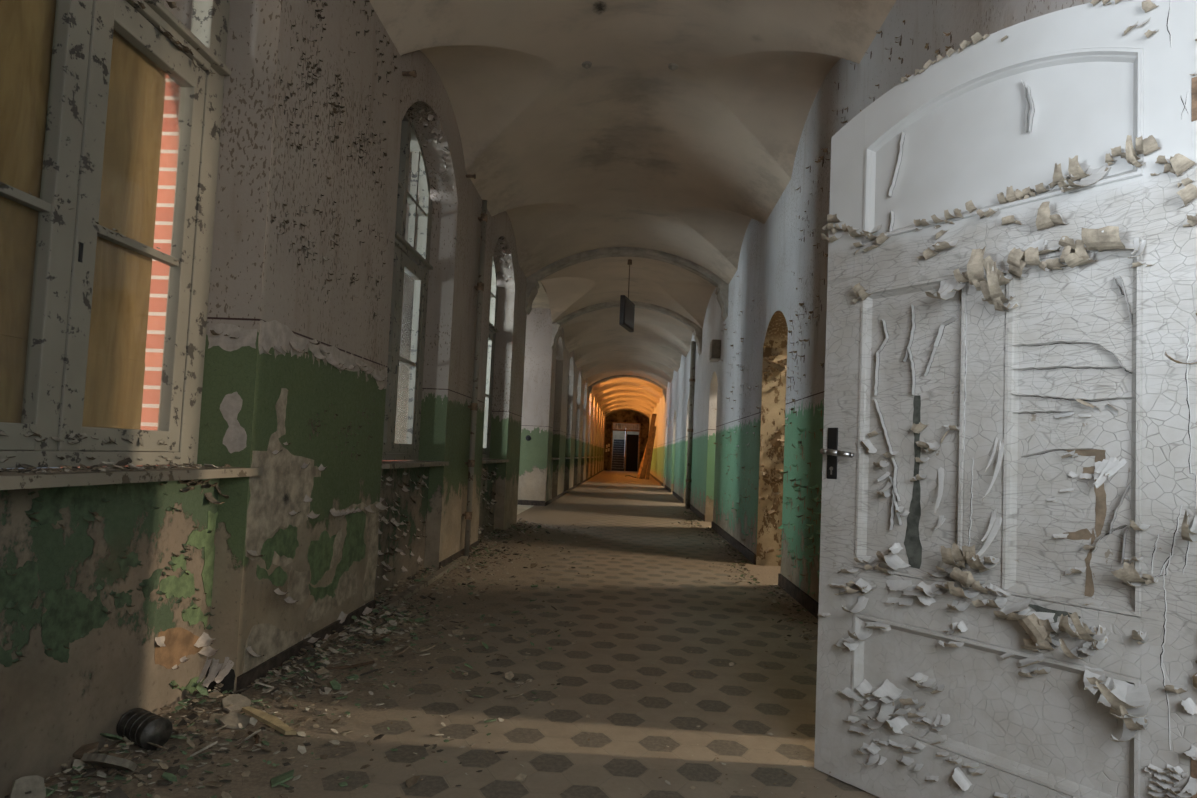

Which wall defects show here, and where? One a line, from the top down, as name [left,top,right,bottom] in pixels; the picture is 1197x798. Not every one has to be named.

flaking render [102,388,428,696]
peeling [208,320,387,390]
peeling [270,0,454,324]
crack [873,305,974,547]
peeling [818,395,1158,742]
peeling [913,135,1197,311]
crack [1021,448,1092,457]
crack [1010,341,1135,414]
crack [1113,276,1133,325]
crack [1092,318,1197,750]
peeling [837,672,987,791]
peeling [1144,744,1197,798]